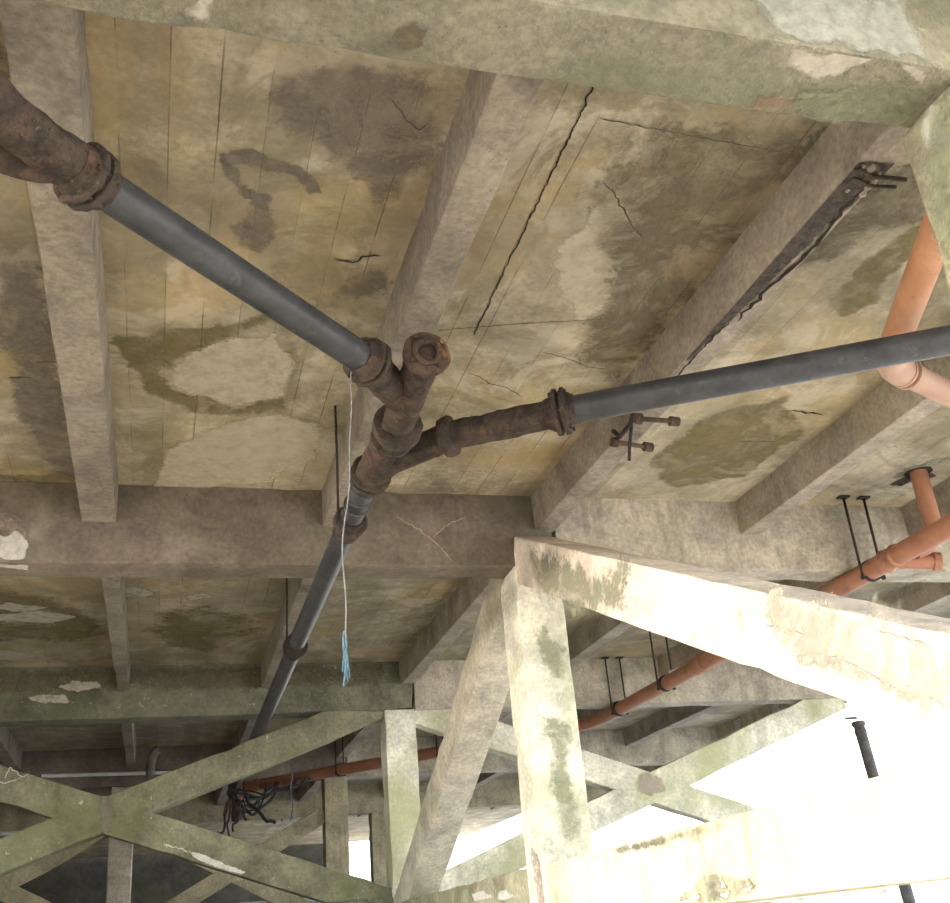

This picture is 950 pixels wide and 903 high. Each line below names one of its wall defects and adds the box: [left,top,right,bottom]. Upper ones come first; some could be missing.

peeling [757,0,926,84]
damp [220,150,321,252]
crack [334,254,379,263]
crack [438,87,673,335]
damp [797,164,925,316]
damp [0,266,75,477]
damp [656,398,803,487]
peeling [0,513,29,570]
peeling [0,602,76,623]
peeling [29,680,101,704]
crack [767,625,910,692]
crack [876,630,932,648]